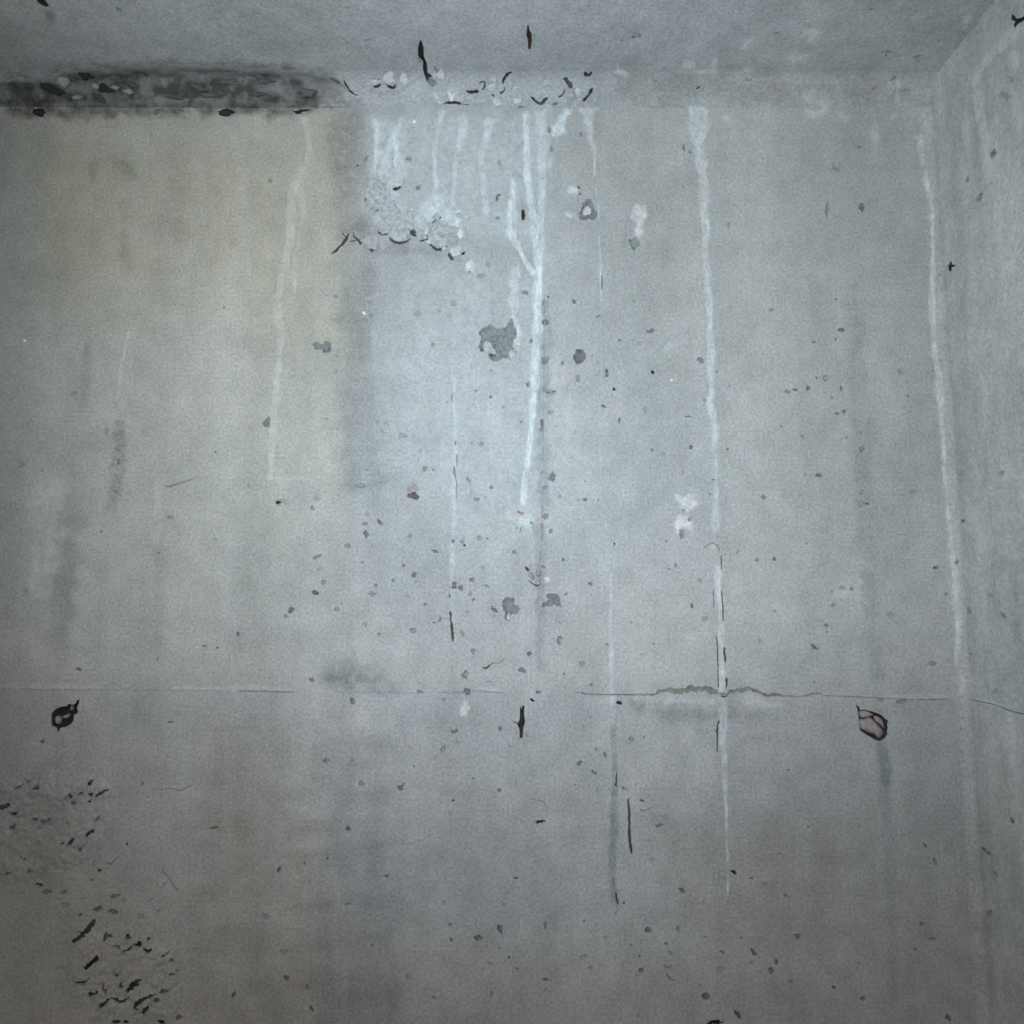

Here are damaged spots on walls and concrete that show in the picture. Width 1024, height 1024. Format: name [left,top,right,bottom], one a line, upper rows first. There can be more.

damp [331,163,470,268]
spalling [573,186,597,220]
spalling [479,318,533,372]
crack [0,686,295,694]
crack [335,658,505,693]
crack [577,555,1024,752]
spalling [859,710,884,738]
peeling [68,780,109,804]
crack [627,798,651,854]
peeling [24,857,179,975]
peeling [74,955,169,1023]